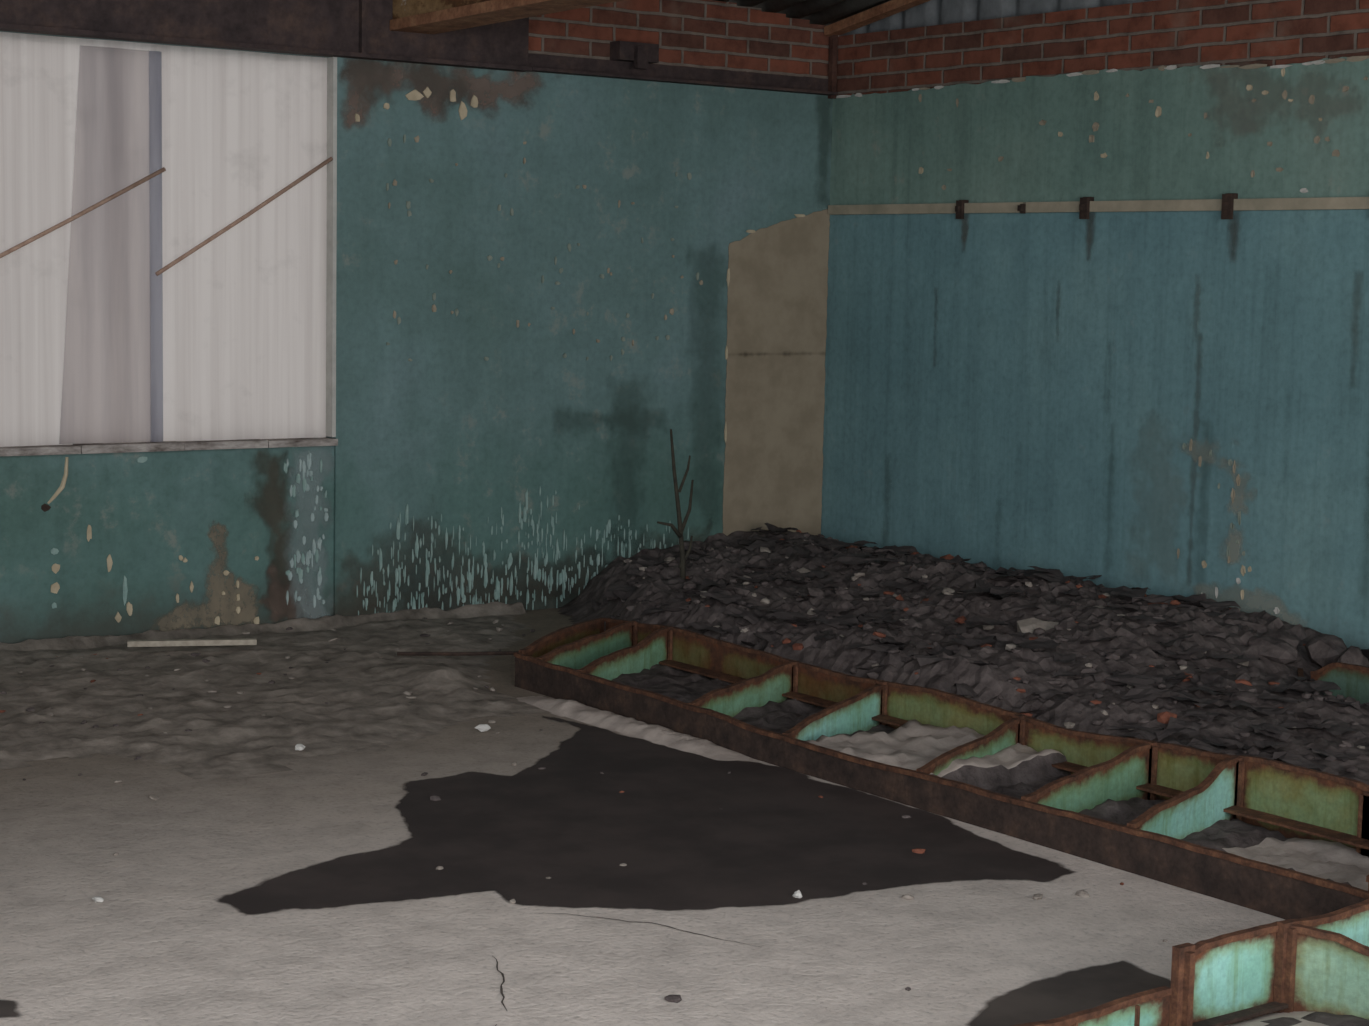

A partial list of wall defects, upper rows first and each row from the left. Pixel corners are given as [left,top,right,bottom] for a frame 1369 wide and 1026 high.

peeling [341,59,540,128]
flaking render [1067,69,1118,101]
flaking render [1200,56,1369,157]
peeling [157,523,261,632]
leakage [256,453,320,620]
crack [494,957,507,1026]